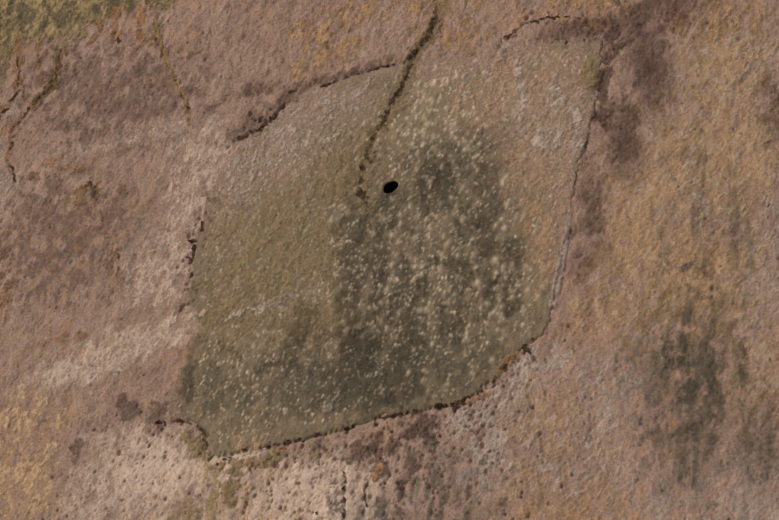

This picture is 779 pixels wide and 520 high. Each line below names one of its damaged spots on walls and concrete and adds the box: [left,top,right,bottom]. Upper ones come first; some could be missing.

crack [0,57,62,182]
crack [320,17,439,208]
water stain [82,111,267,309]
water stain [404,0,779,520]
water stain [0,313,195,518]
crack [155,418,320,465]
water stain [83,418,410,520]
peeling [218,446,287,508]
spalling [344,409,450,482]
spalling [395,479,405,515]
crack [381,364,508,419]
peeling [459,377,626,494]